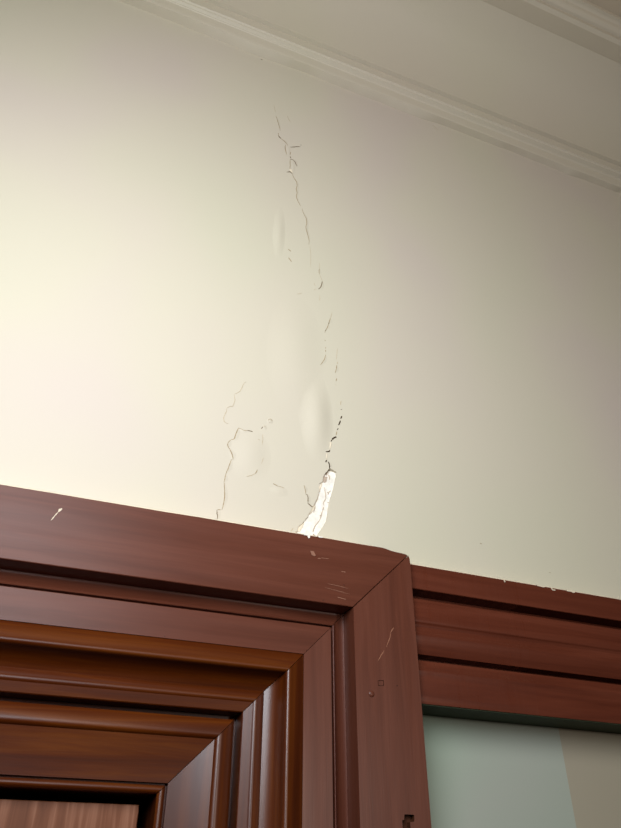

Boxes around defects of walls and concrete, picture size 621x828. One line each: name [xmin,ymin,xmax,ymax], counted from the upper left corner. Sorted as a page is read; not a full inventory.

crack [274,107,324,290]
crack [320,314,339,381]
crack [217,384,253,520]
crack [325,402,342,468]
peeling [291,468,336,536]